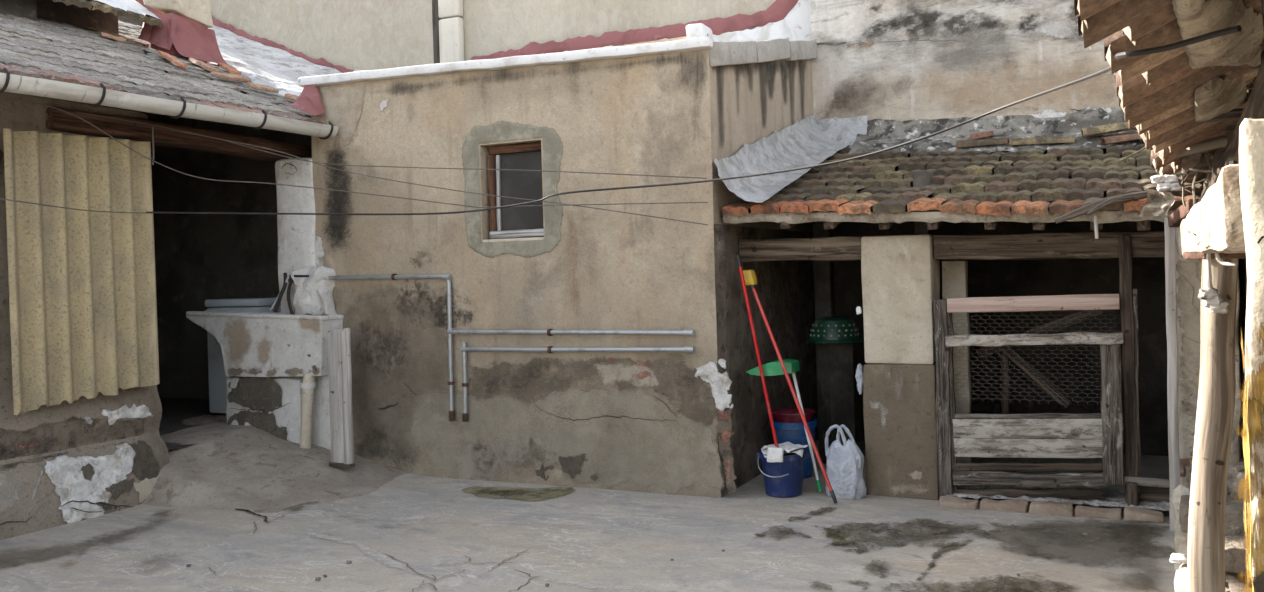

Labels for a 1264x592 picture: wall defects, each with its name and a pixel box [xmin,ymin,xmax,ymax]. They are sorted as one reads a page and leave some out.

water stain [864,0,1003,65]
water stain [1020,0,1083,38]
mould [326,150,350,245]
peeling [0,404,160,524]
water stain [343,286,472,458]
flaking render [468,354,737,495]
crack [534,396,677,428]
peeling [1235,322,1264,592]
crack [235,505,645,592]
water stain [974,518,1175,592]